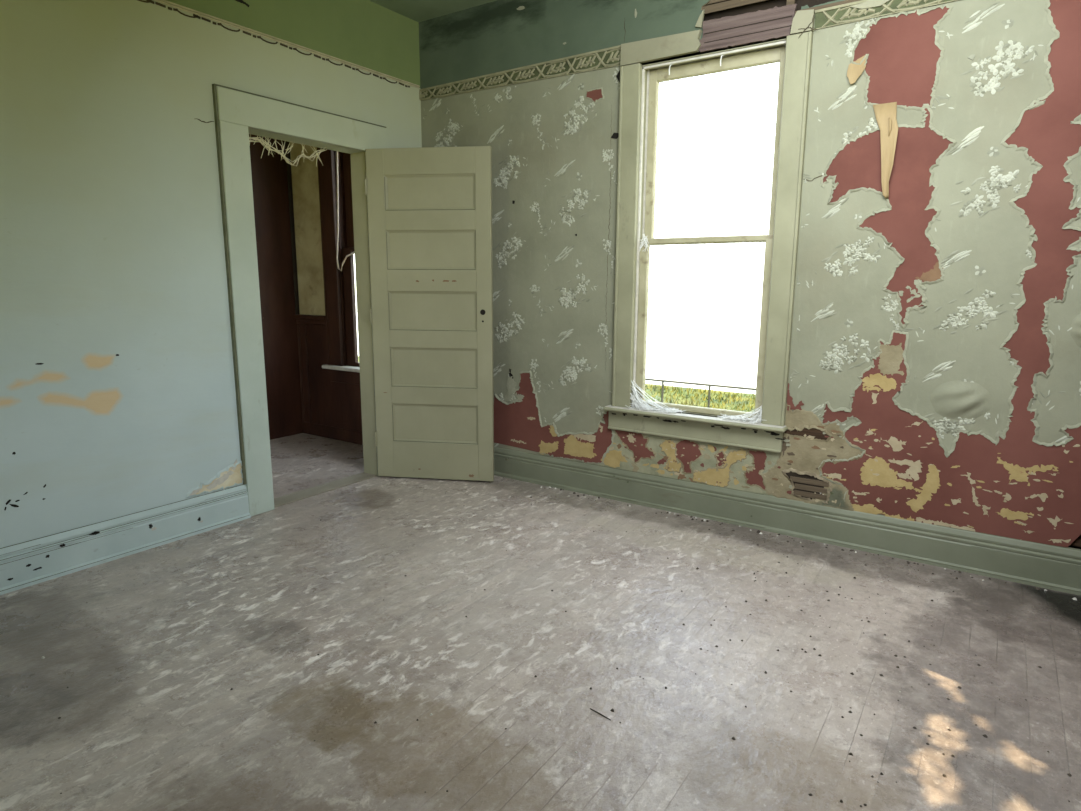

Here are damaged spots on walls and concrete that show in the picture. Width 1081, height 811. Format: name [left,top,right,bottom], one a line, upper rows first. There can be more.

flaking render [494,0,1081,549]
peeling [33,384,127,420]
peeling [185,459,243,498]